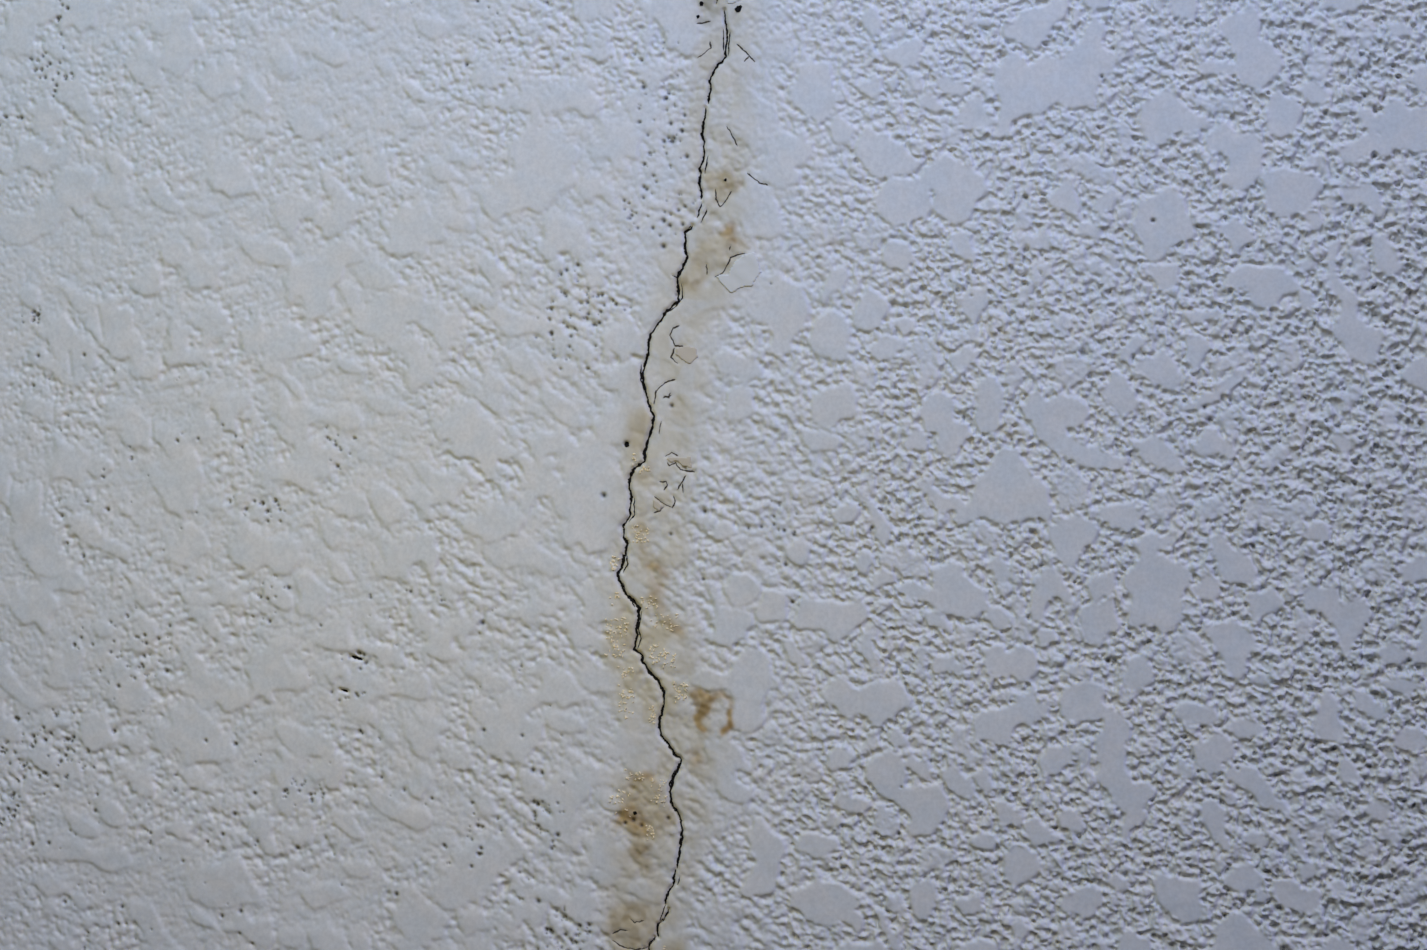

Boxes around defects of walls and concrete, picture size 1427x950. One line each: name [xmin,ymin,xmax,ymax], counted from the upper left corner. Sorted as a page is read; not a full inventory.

damp [586,0,772,950]
crack [613,0,768,950]